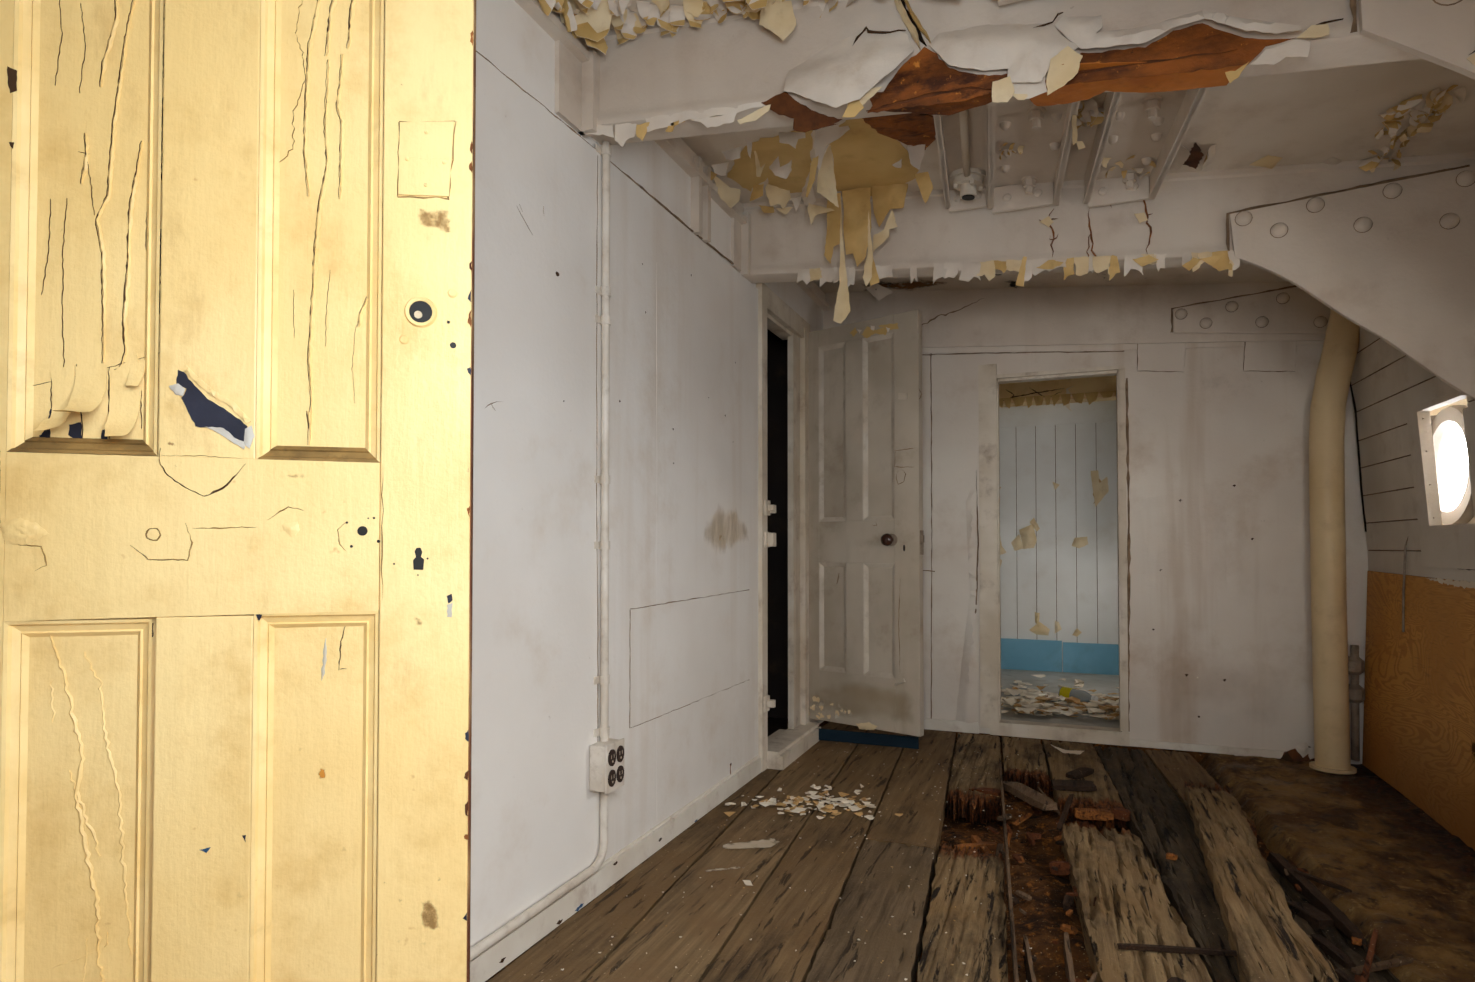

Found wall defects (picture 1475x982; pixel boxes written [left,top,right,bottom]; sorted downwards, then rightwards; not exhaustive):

peeling [538,0,855,55]
peeling [1323,85,1466,173]
peeling [585,9,1344,338]
spalling [447,0,476,982]
peeling [809,696,877,730]